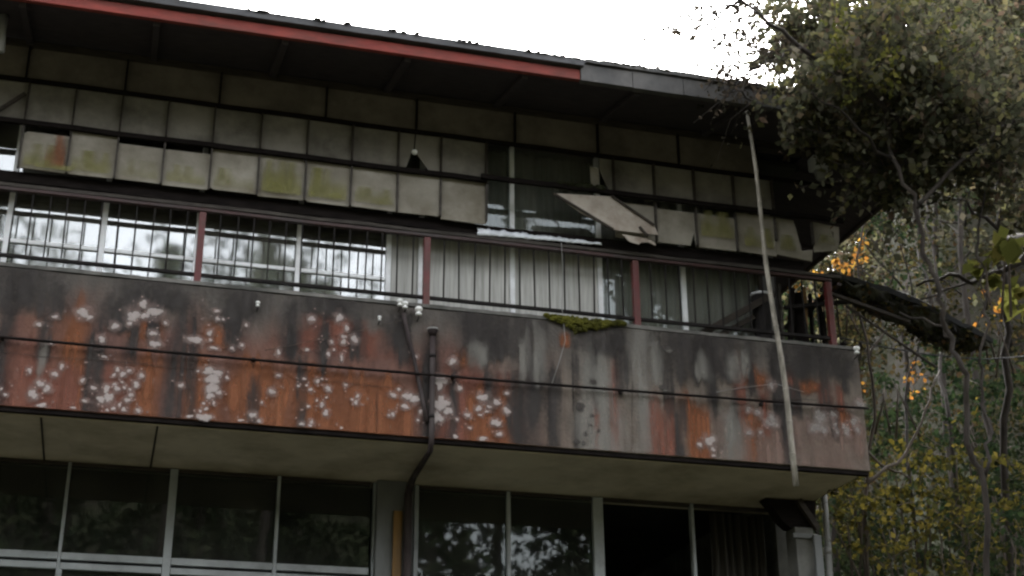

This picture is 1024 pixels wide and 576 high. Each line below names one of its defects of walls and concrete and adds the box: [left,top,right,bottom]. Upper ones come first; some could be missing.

peeling [0,363,68,407]
rust [0,300,85,411]
peeling [35,296,169,413]
rust [128,319,163,416]
rust [183,356,218,421]
peeling [181,299,248,421]
peeling [237,308,369,429]
rust [228,355,412,436]
rust [299,316,378,356]
water stain [461,312,756,456]
rust [648,373,864,469]